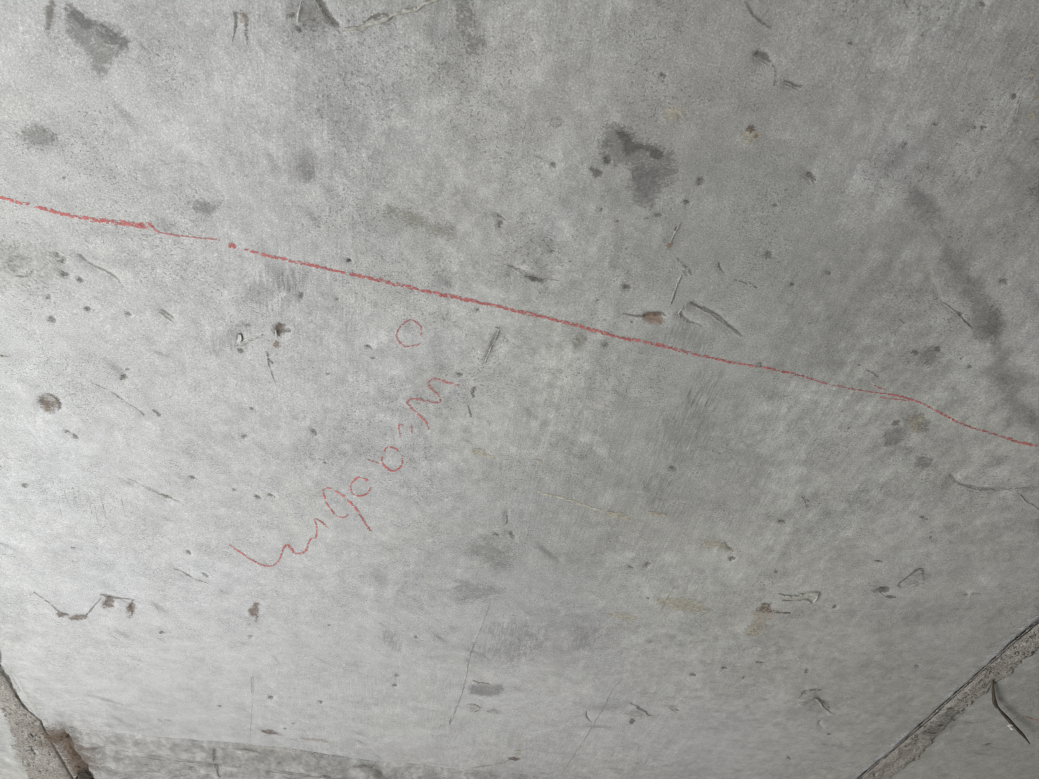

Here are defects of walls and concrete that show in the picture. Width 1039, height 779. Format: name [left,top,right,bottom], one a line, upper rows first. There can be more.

crack [860,622,1039,779]